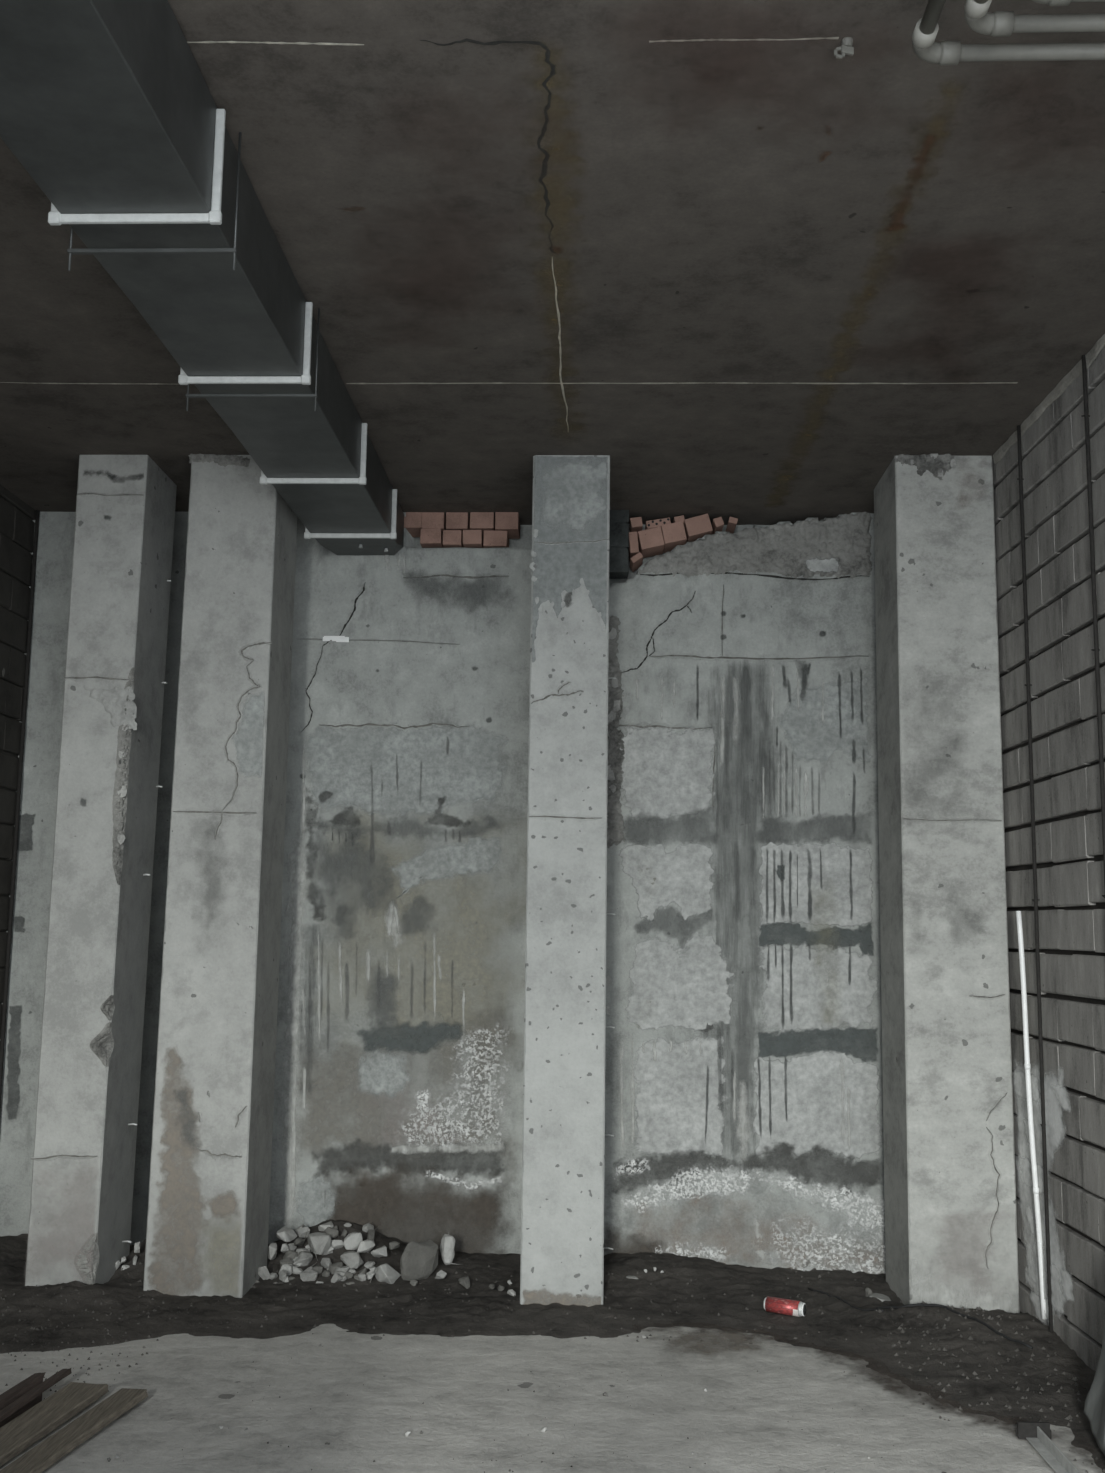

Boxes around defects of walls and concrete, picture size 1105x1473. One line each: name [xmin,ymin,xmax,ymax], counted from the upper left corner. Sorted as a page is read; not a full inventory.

crack [420,38,568,425]
spalling [83,667,137,885]
crack [173,582,470,840]
crack [403,571,509,583]
crack [608,716,718,813]
crack [531,571,870,704]
spalling [90,995,115,1067]
water stain [604,664,886,1274]
water stain [917,1283,1010,1312]
water stain [1014,1067,1074,1325]